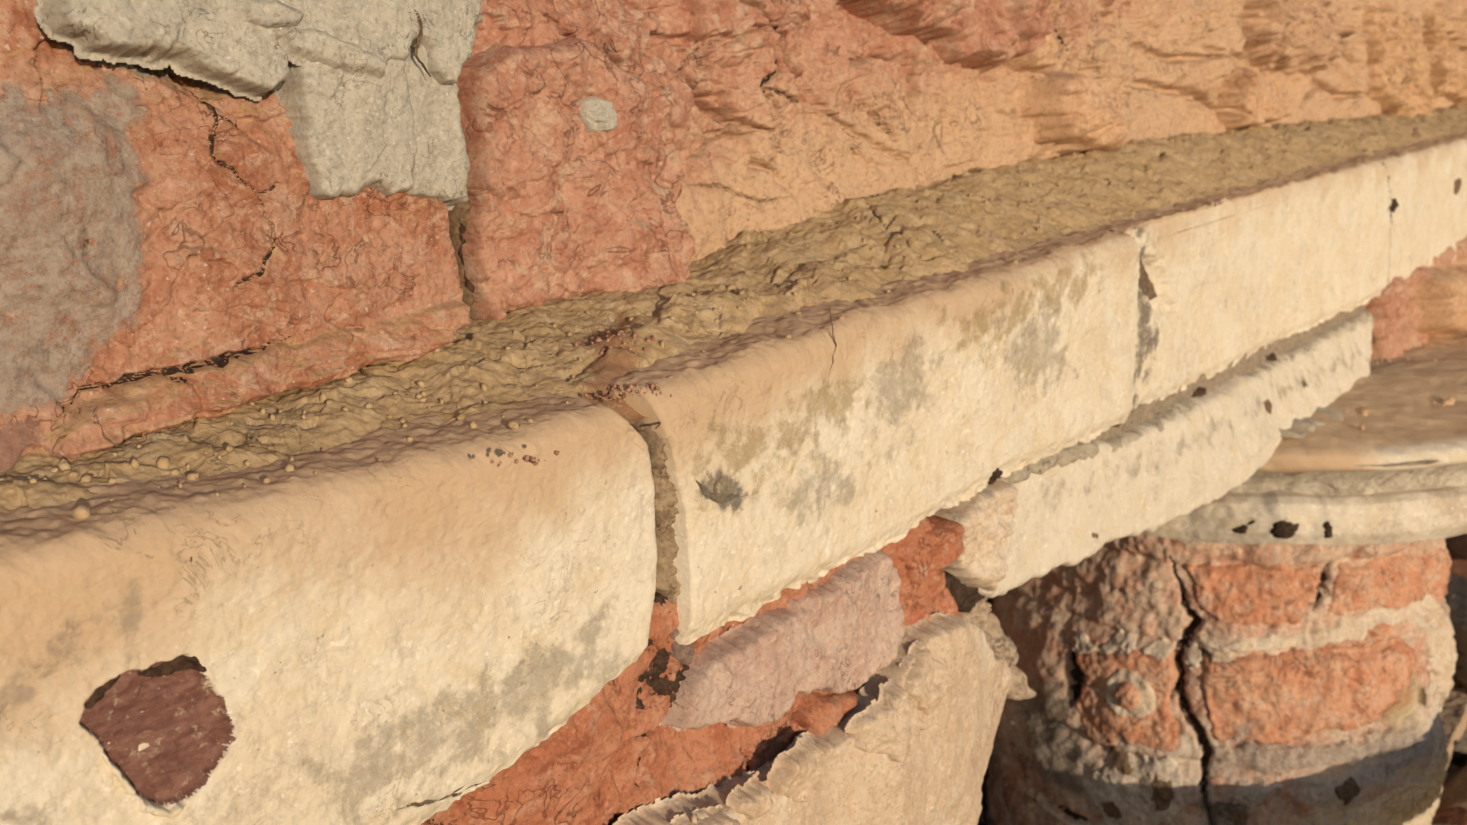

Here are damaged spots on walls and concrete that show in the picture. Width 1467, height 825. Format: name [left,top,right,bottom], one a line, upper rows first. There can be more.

crack [414,10,432,77]
crack [168,74,280,287]
peeling [1138,261,1157,300]
crack [51,330,306,423]
peeling [79,655,236,819]
crack [1170,556,1213,820]